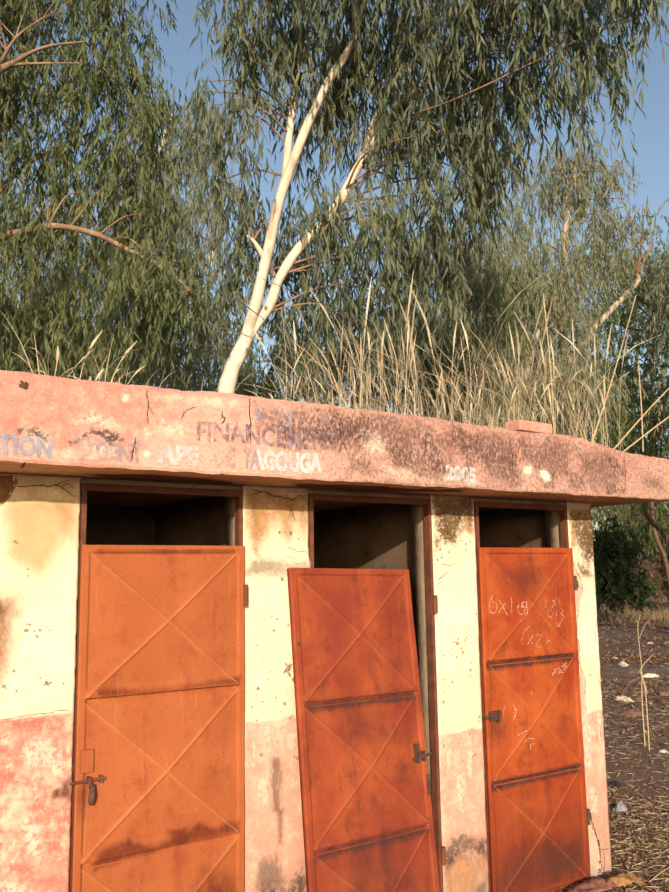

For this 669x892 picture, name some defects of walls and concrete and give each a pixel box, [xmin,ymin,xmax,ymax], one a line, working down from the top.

crack [130,392,154,461]
crack [17,462,76,497]
water stain [263,415,519,485]
water stain [522,440,569,484]
water stain [571,455,618,489]
corrosion [486,654,575,668]
corrosion [307,692,415,711]
peeling [5,736,71,780]
corrosion [491,764,582,790]
peeling [18,813,46,861]
corrosion [95,825,235,866]
peeling [0,881,31,892]